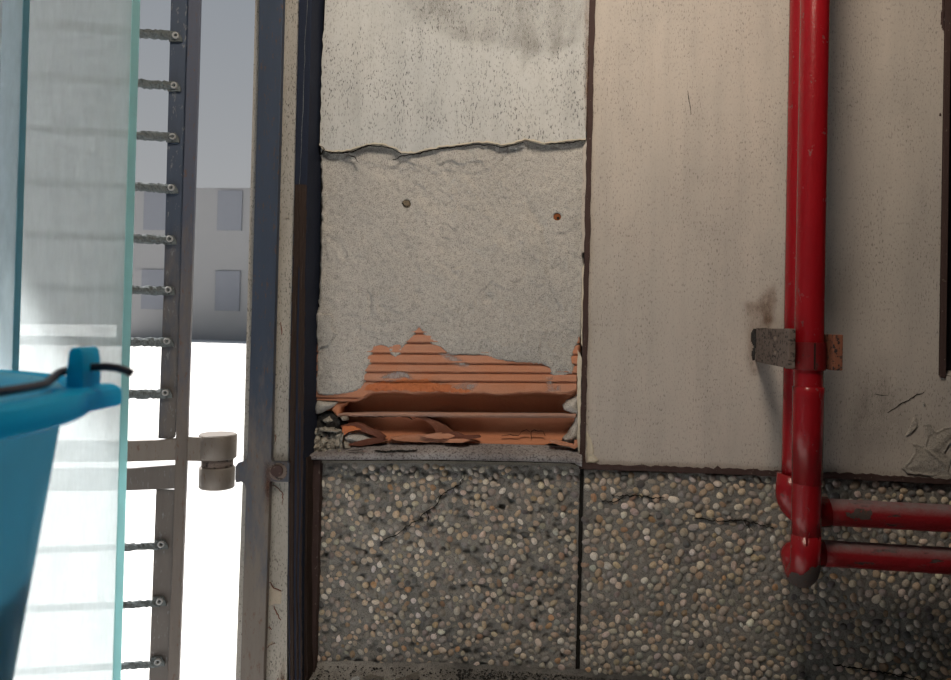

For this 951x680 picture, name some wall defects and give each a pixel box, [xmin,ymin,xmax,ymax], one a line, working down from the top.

crack [319,142,523,163]
flaking render [315,138,599,463]
crack [602,494,665,503]
crack [380,476,465,543]
crack [695,518,774,530]